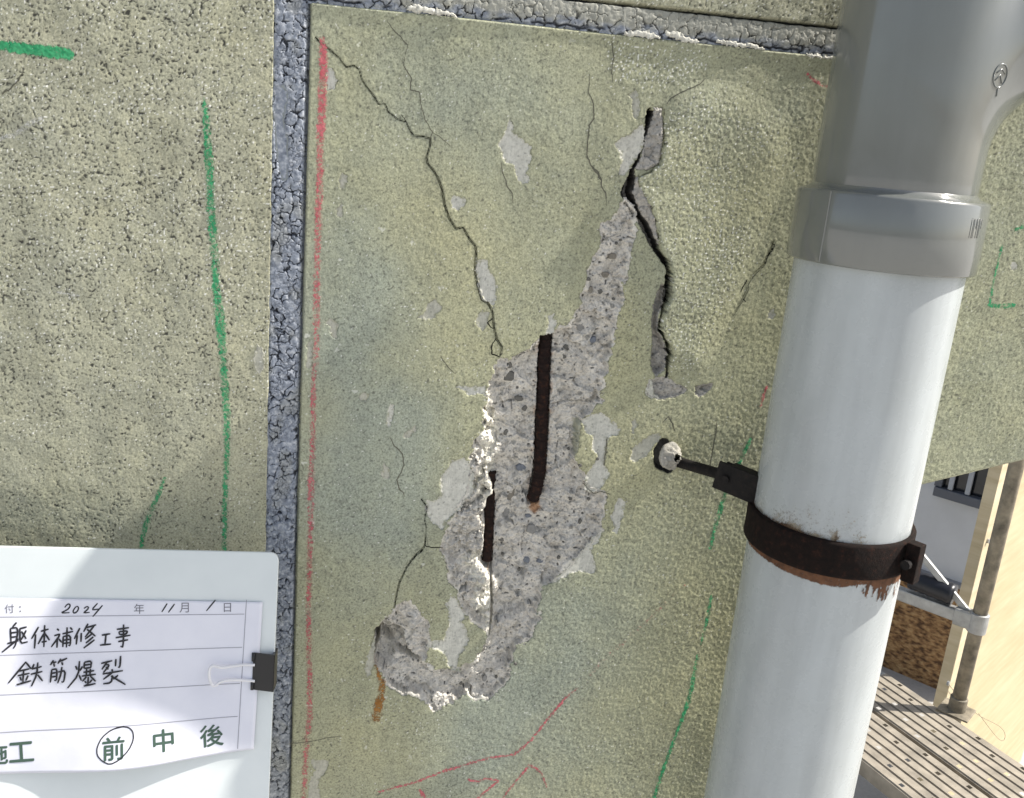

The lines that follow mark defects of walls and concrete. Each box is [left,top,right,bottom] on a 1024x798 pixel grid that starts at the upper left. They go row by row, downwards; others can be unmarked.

crack [316,23,503,357]
crack [586,41,706,378]
crack [390,438,443,603]
spalling [364,107,664,712]
corrosion [372,659,386,722]